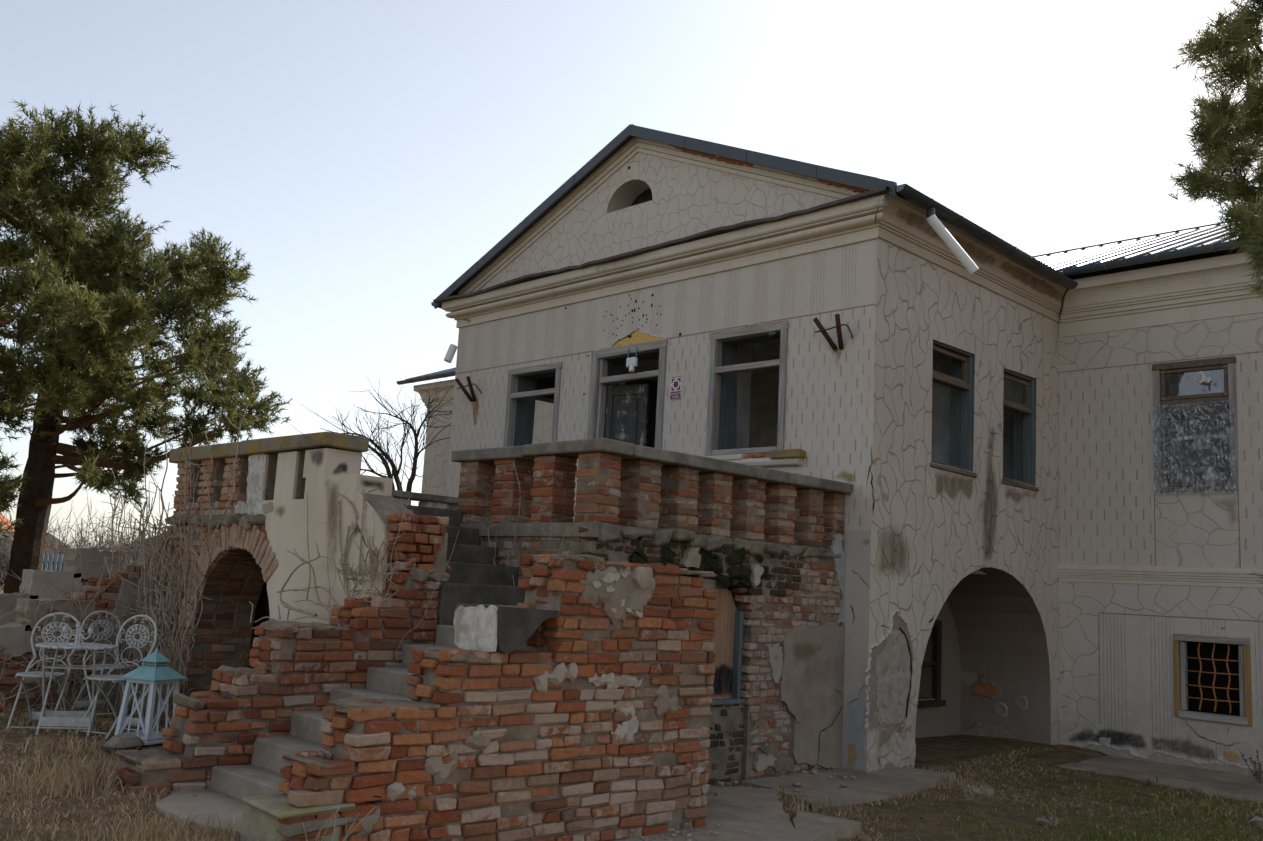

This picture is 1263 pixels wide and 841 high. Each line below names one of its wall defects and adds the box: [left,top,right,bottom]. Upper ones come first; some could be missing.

water stain [984,469,1020,557]
peeling [592,571,643,617]
peeling [830,534,846,624]
spalling [864,610,915,732]